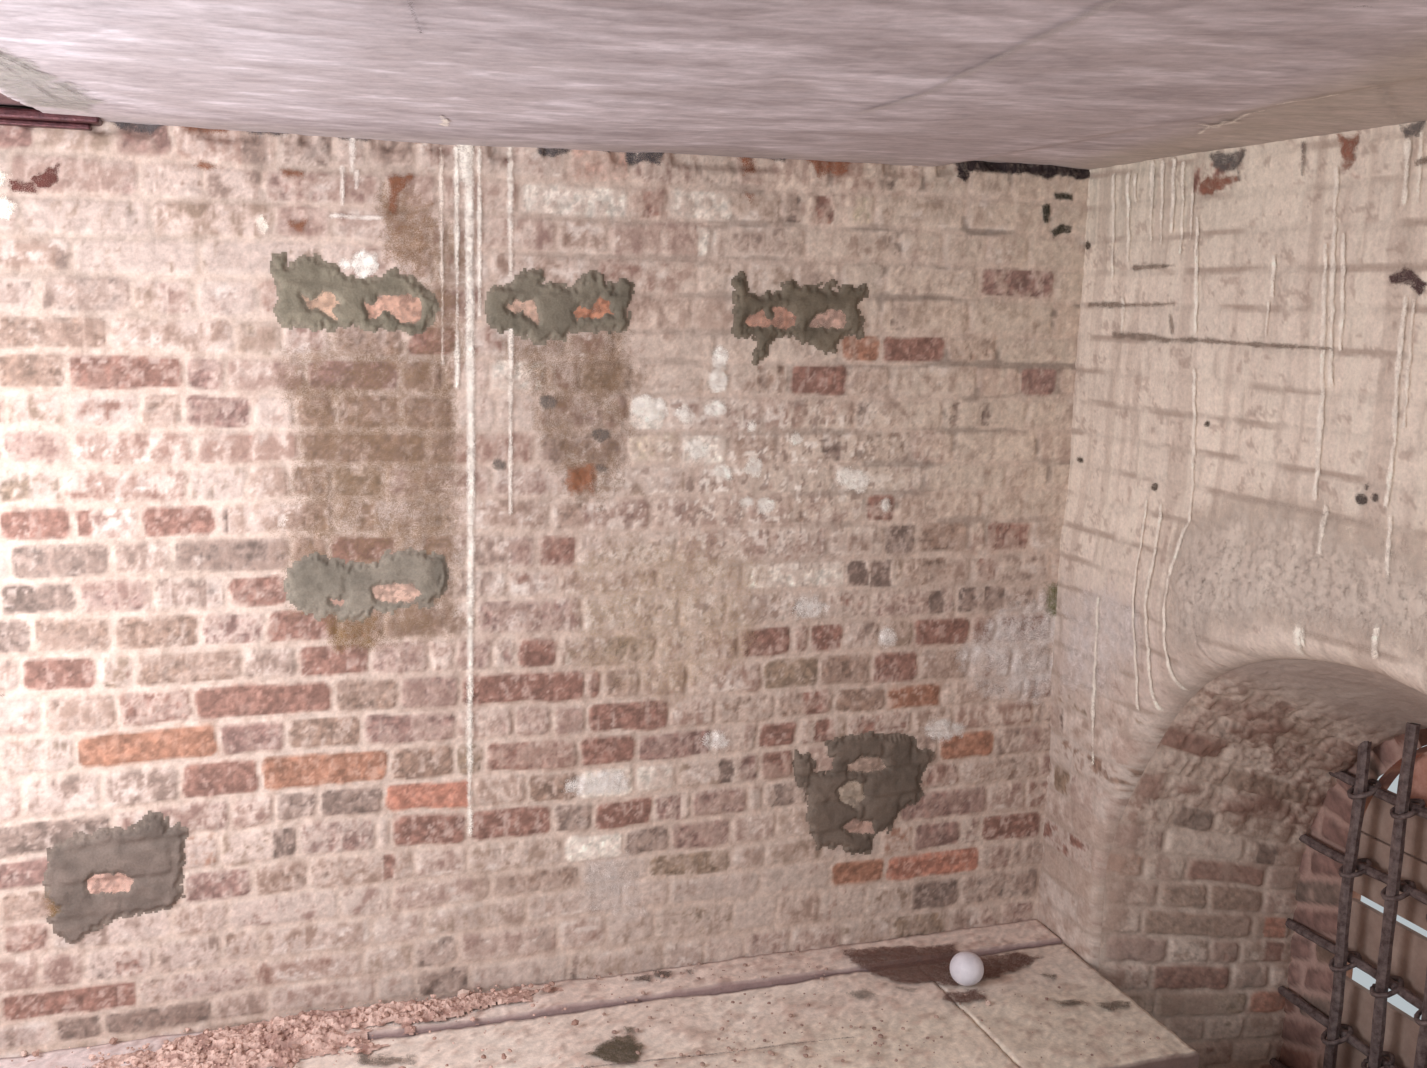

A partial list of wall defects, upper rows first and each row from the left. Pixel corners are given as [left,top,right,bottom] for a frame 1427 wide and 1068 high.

water stain [1400,130,1424,205]
water stain [505,147,515,278]
water stain [1110,158,1200,334]
flaking render [364,293,422,324]
flaking render [506,299,540,324]
flaking render [745,306,846,330]
water stain [495,329,763,516]
water stain [1292,165,1346,655]
water stain [1369,295,1416,659]
flaking render [372,583,421,605]
flaking render [838,755,886,835]
flaking render [87,873,134,895]